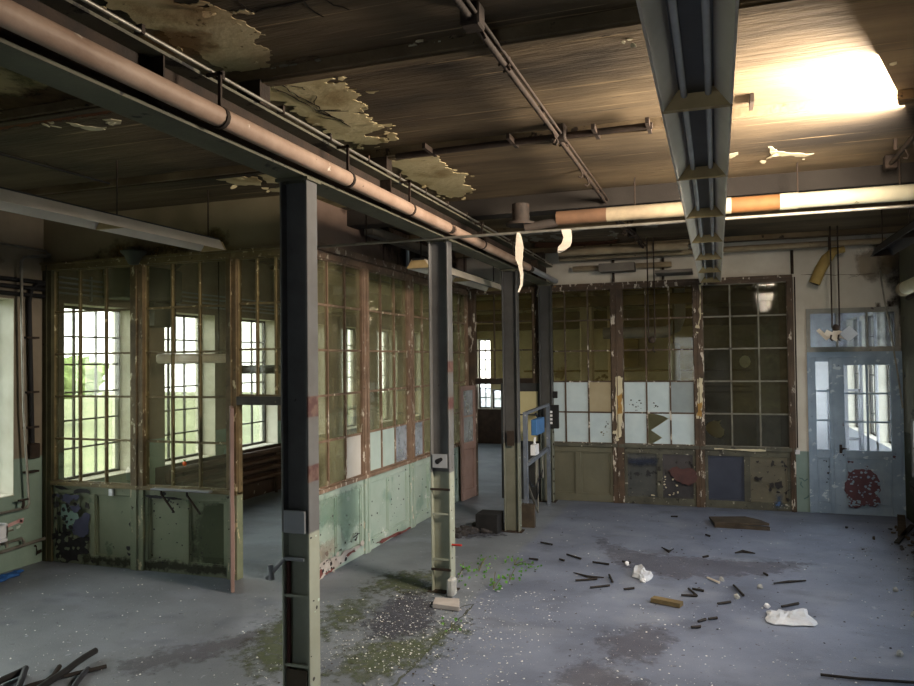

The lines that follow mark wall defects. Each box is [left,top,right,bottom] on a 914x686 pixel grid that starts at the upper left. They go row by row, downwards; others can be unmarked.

peeling [101,0,273,72]
water stain [0,86,79,111]
peeling [41,119,121,131]
crack [273,85,351,127]
peeling [270,76,399,149]
peeling [760,146,814,163]
peeling [216,174,280,192]
peeling [392,156,476,200]
peeling [613,376,624,441]
peeling [52,486,93,563]
peeling [320,515,411,579]